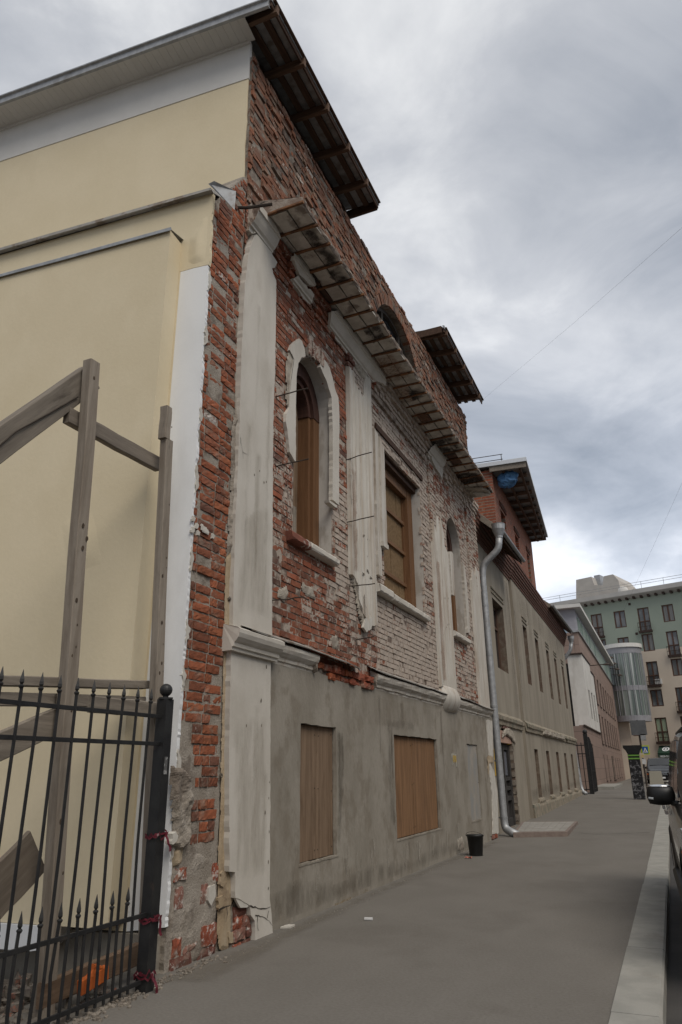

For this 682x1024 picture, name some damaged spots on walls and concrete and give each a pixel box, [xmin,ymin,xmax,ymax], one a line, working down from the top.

spalling [189,385,238,625]
flaking render [318,662,374,690]
flaking render [165,652,252,972]
crack [218,905,272,931]